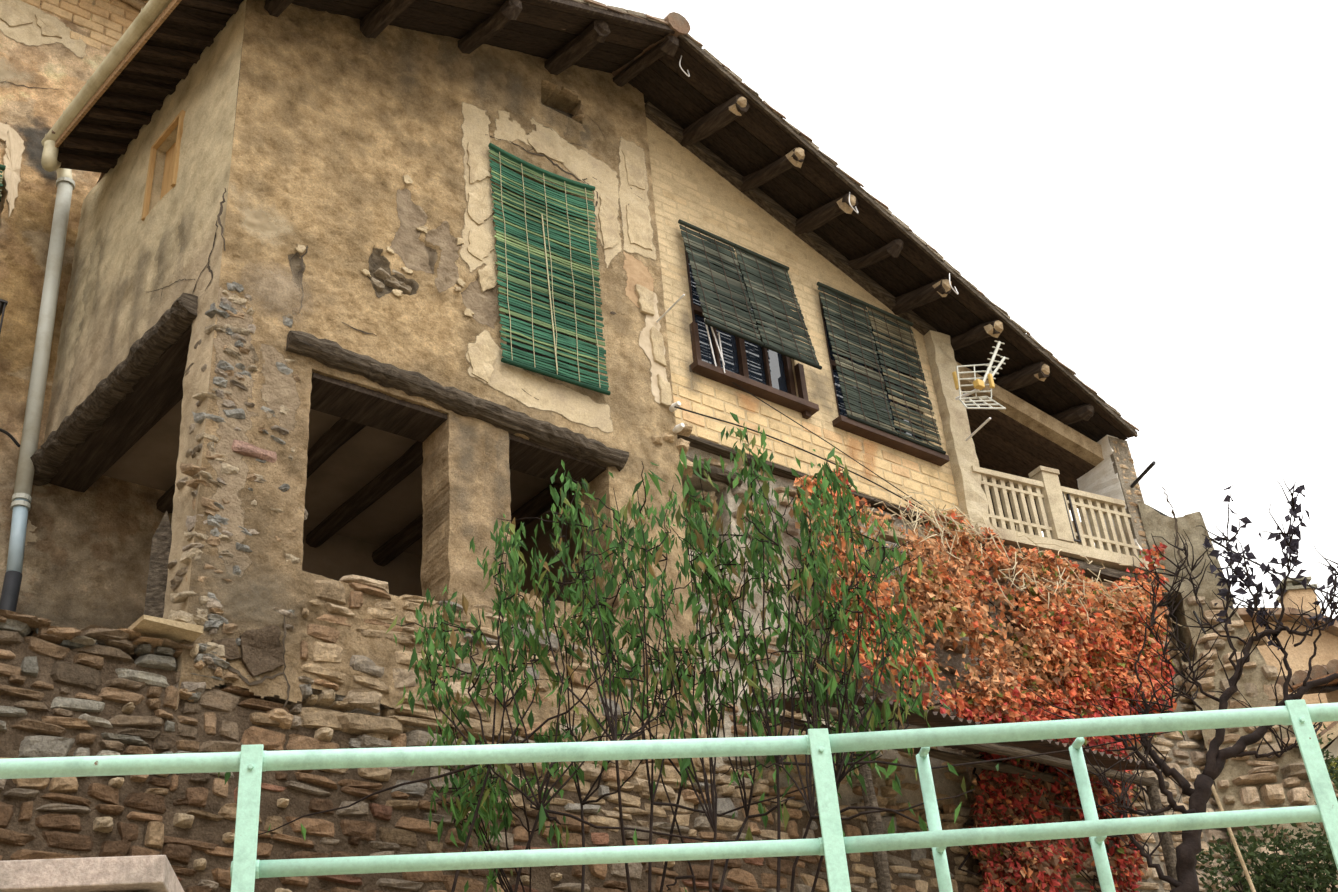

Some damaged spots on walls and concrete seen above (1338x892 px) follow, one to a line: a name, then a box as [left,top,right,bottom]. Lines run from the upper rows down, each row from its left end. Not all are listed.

crack [151,188,226,296]
flaking render [360,102,672,433]
flaking render [211,625,284,678]